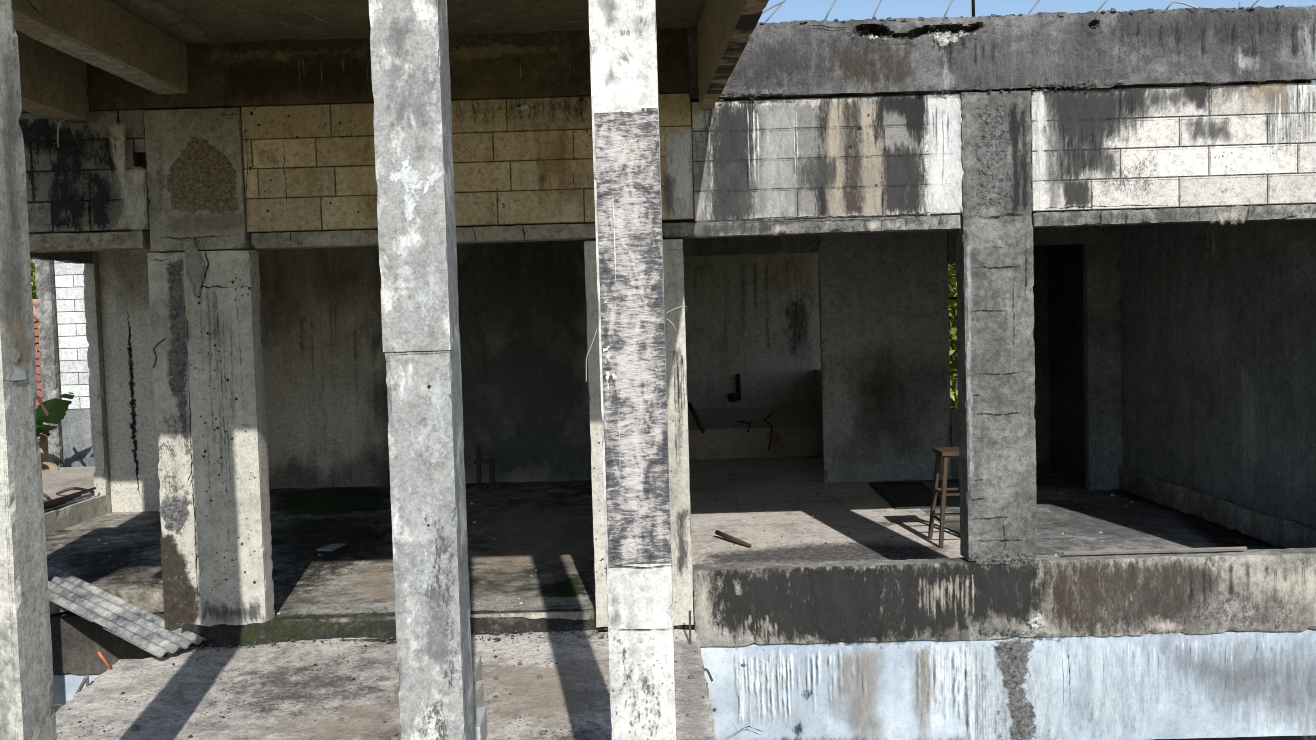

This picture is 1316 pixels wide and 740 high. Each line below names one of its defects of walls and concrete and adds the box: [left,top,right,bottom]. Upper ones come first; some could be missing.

spalling [760,0,976,46]
spalling [1079,0,1259,14]
leakage [4,60,134,313]
flaking render [167,137,239,214]
leakage [704,37,964,235]
leakage [1010,83,1316,228]
leakage [483,664,607,716]
leakage [611,489,1316,740]
flaking render [980,614,1066,740]